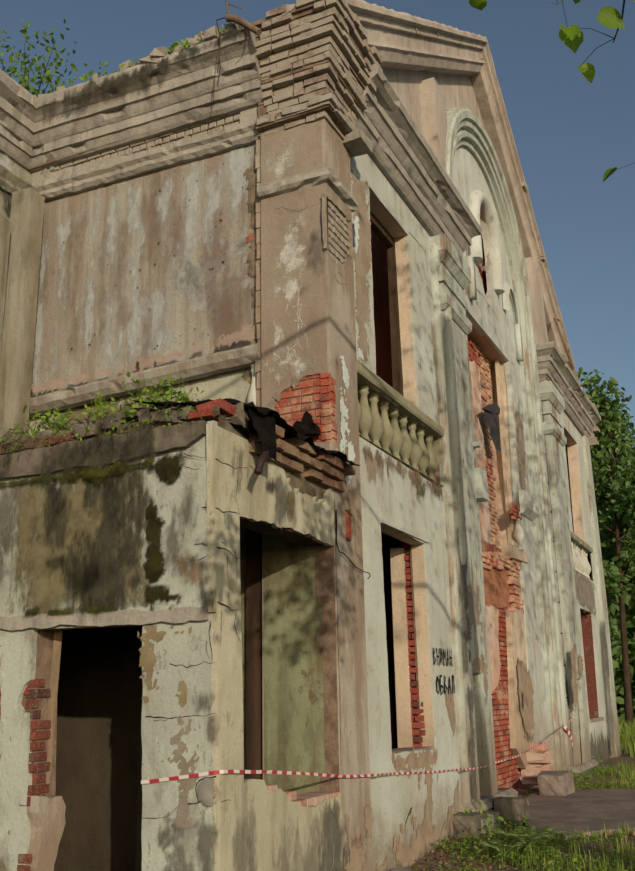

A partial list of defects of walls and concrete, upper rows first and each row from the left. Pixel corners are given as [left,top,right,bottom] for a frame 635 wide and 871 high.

leakage [43,26,247,110]
leakage [39,198,117,357]
leakage [105,186,171,372]
leakage [172,147,252,292]
spalling [251,0,383,365]
leakage [0,427,161,614]
spalling [269,355,361,583]
spalling [482,551,524,613]
peeling [137,624,192,703]
crack [145,697,215,721]
peeling [517,656,535,740]
peeling [342,746,460,871]